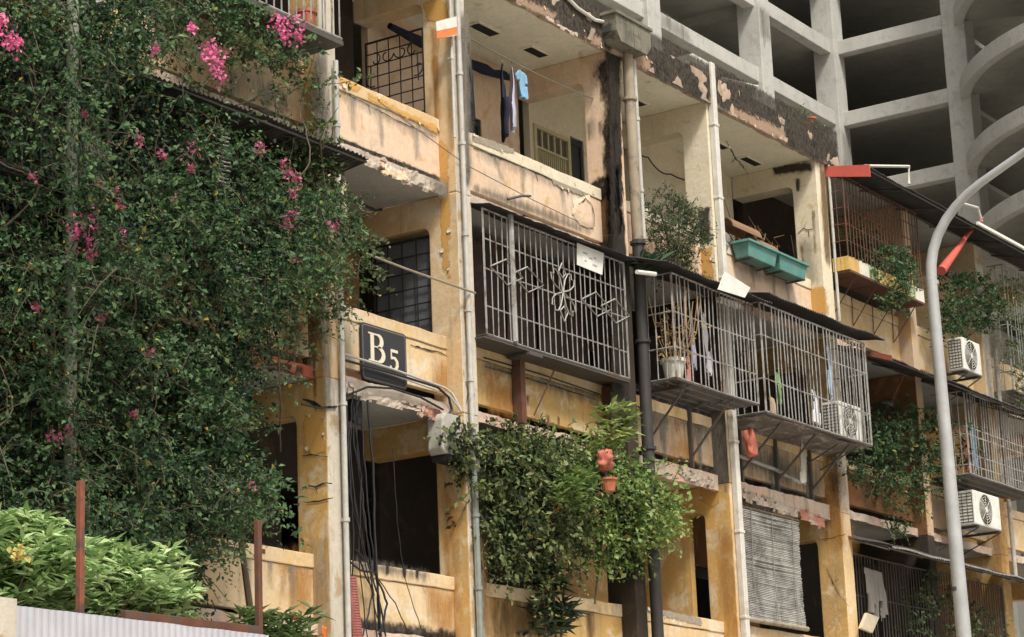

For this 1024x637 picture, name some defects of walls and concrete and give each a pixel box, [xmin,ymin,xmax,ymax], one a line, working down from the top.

peeling [516,0,602,48]
peeling [633,56,652,70]
peeling [734,108,786,139]
peeling [339,77,451,278]
water stain [510,0,629,423]
spalling [346,383,442,422]
spalling [743,488,825,529]